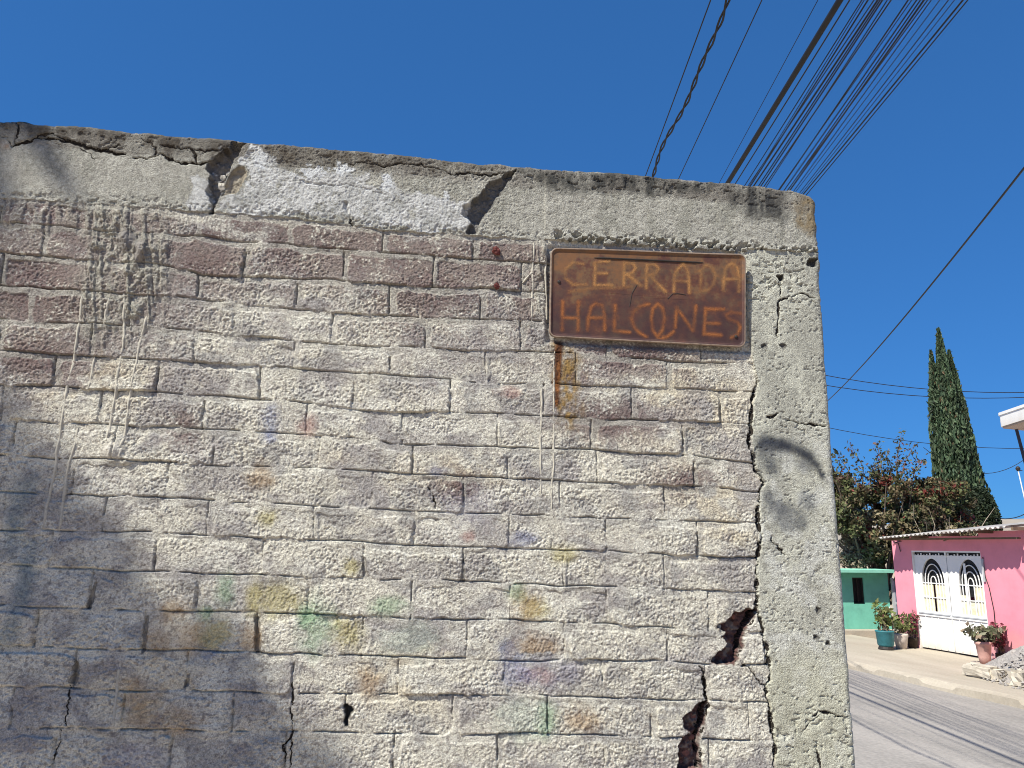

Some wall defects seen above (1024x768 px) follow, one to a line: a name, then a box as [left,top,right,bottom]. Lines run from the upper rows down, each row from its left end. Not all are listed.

crack [7,123,220,166]
crack [775,284,811,338]
corrosion [553,342,576,423]
crack [282,682,294,768]
crack [692,667,710,767]